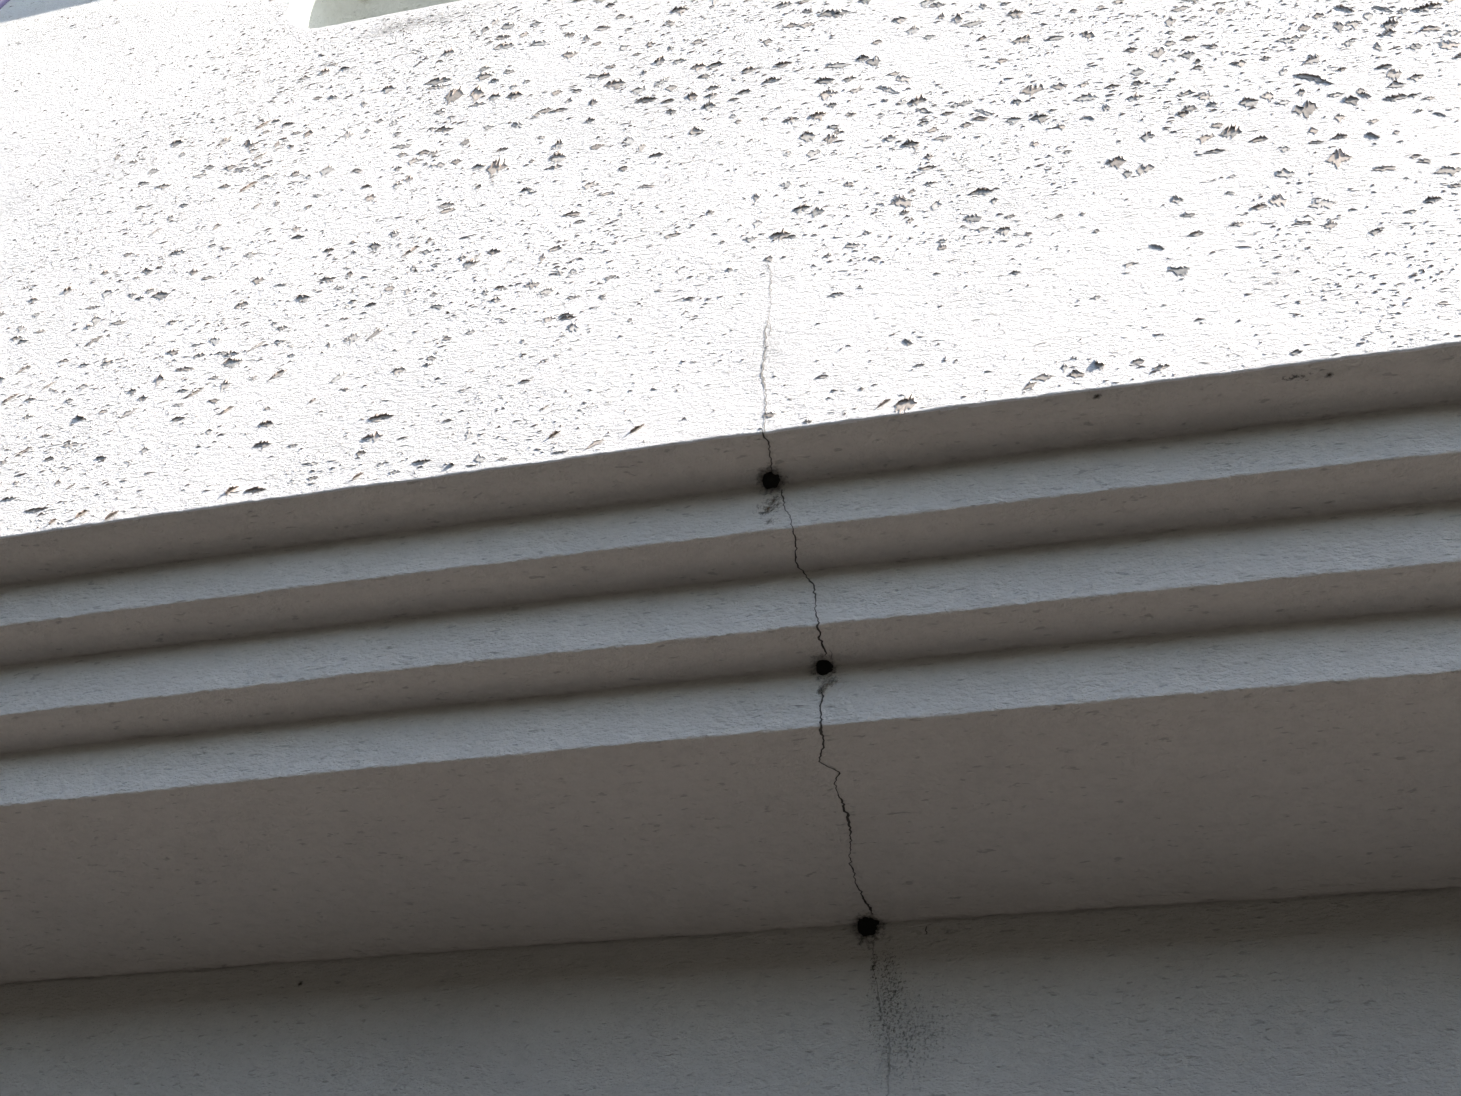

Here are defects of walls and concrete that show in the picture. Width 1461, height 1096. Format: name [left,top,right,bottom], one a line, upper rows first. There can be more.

crack [761,262,833,657]
crack [789,692,891,1096]